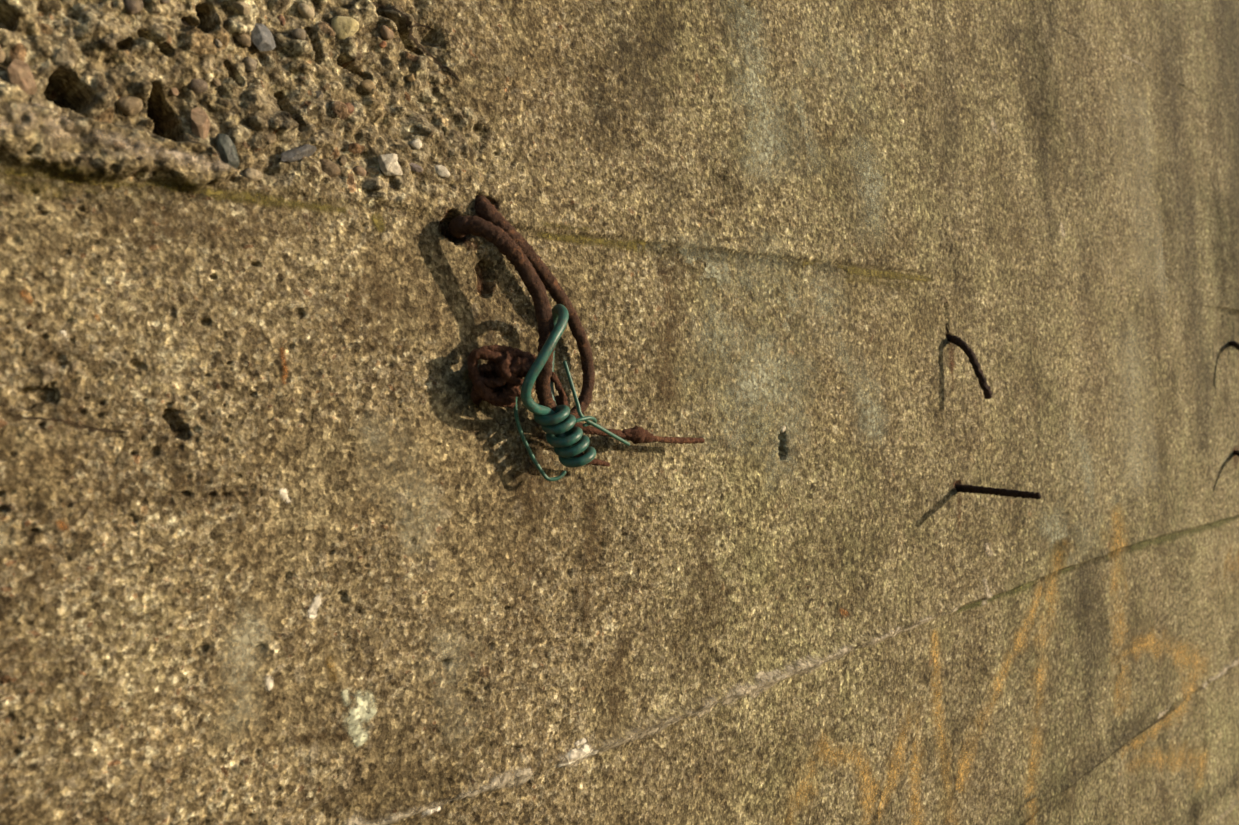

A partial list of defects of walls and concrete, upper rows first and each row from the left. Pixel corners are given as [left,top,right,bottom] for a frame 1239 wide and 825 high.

spalling [0,0,485,201]